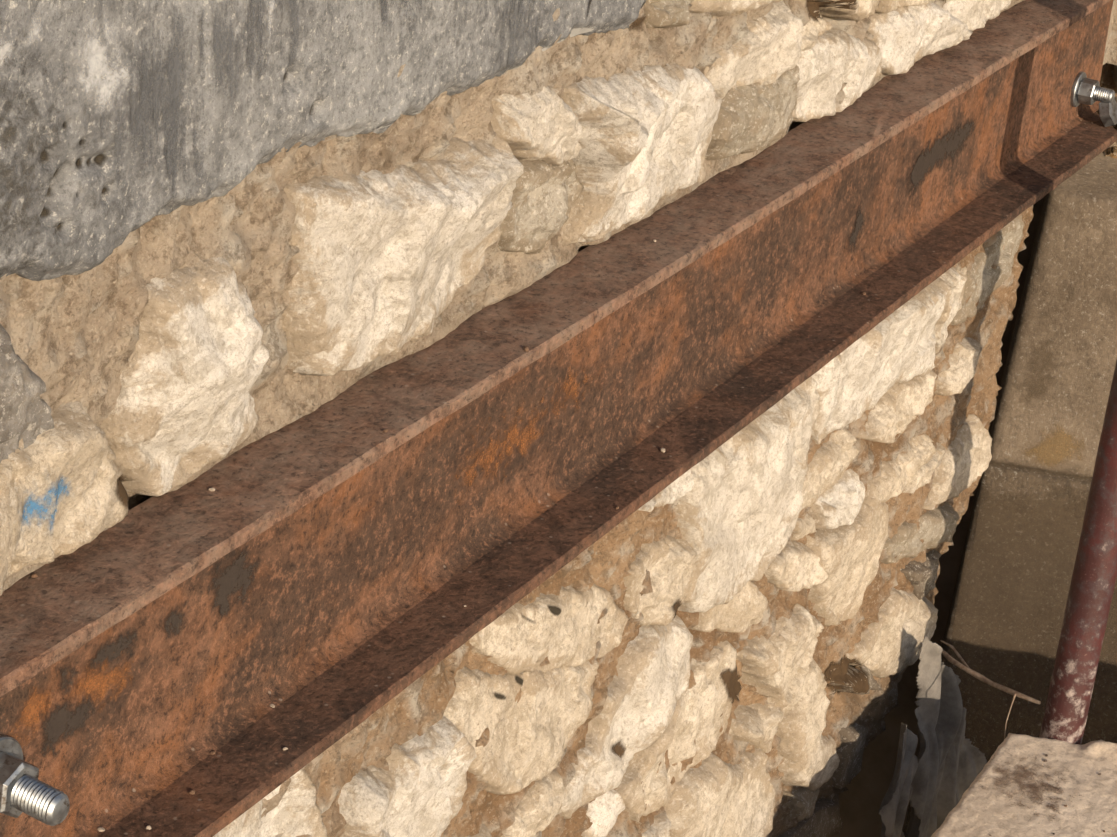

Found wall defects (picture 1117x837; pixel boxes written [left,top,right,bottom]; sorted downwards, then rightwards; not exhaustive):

corrosion [75,662,128,700]
corrosion [21,694,50,728]